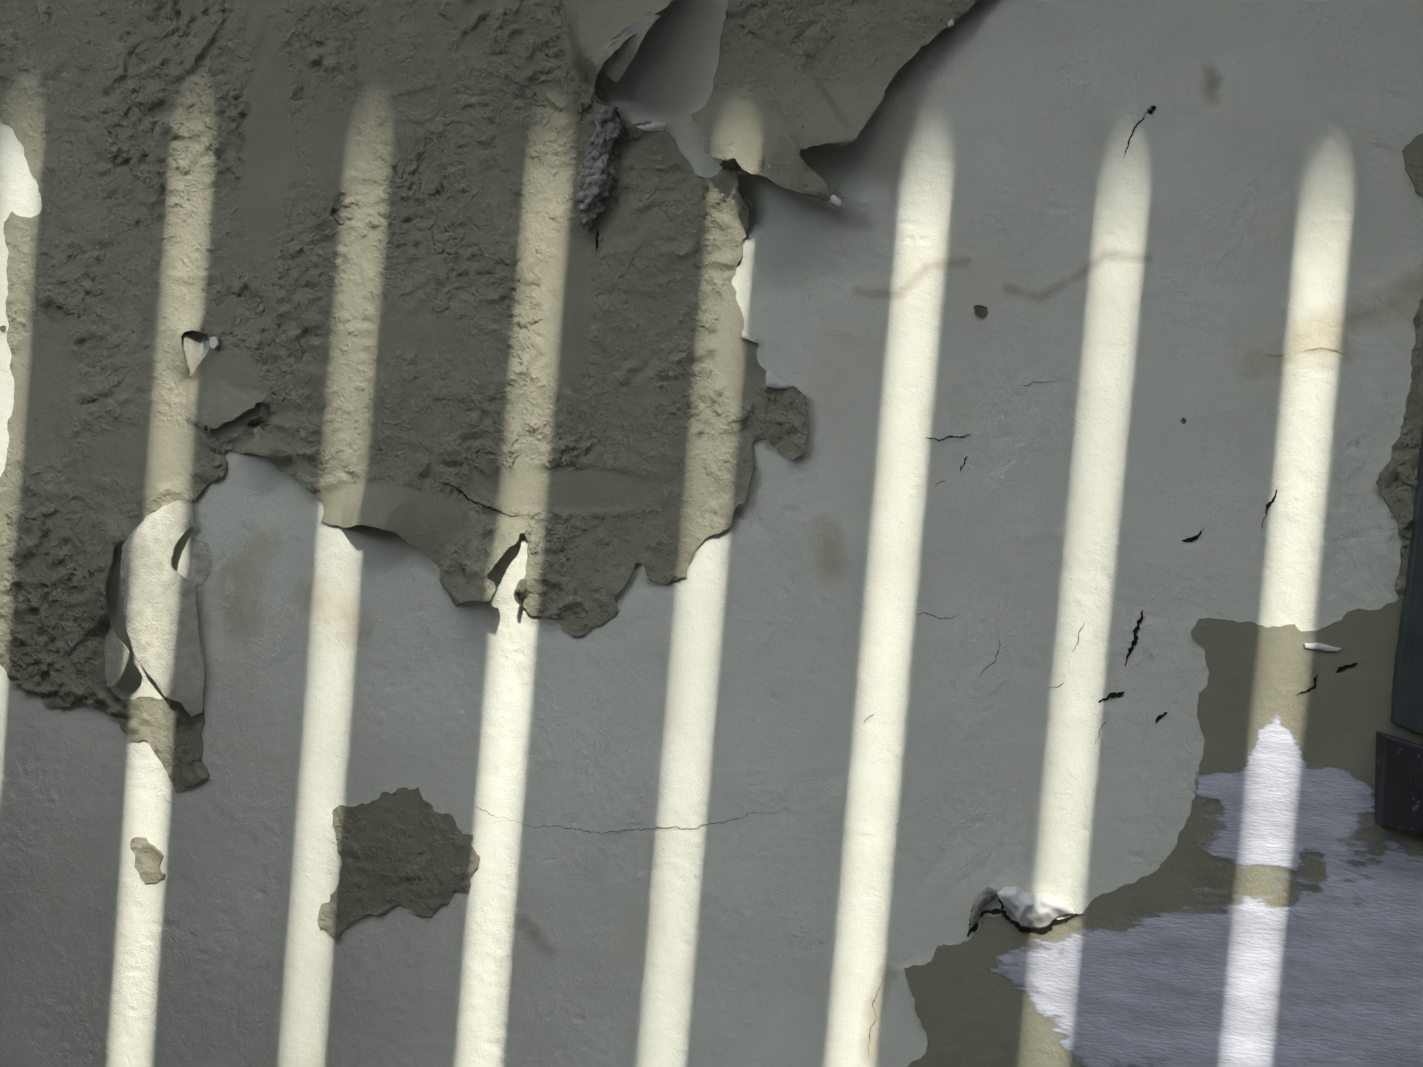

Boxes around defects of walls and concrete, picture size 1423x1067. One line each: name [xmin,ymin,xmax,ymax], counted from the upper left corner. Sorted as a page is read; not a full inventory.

peeling [560,0,675,95]
peeling [595,0,728,178]
peeling [692,0,978,207]
peeling [0,119,42,476]
peeling [182,331,273,438]
peeling [766,370,788,389]
peeling [297,452,529,605]
peeling [104,500,205,717]
peeling [1304,643,1341,651]
peeling [130,837,165,883]
peeling [317,787,480,939]
peeling [997,886,1075,929]